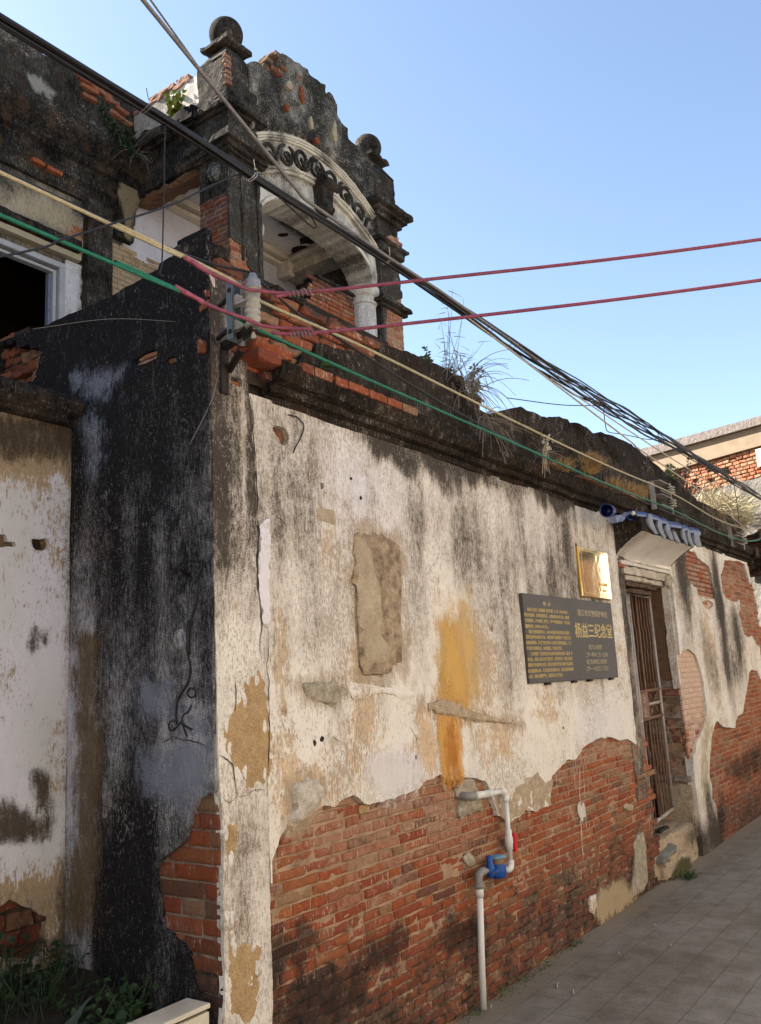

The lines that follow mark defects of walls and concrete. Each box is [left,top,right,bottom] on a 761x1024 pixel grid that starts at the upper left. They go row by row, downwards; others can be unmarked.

flaking render [200,191,250,271]
flaking render [0,326,41,383]
damp [69,368,124,398]
flaking render [686,529,761,654]
damp [0,768,54,845]
damp [66,631,106,943]
peeling [224,670,287,789]
corrosion [435,591,479,789]
flaking render [676,650,761,841]
flaking render [0,900,46,959]
flaking render [160,736,662,1024]